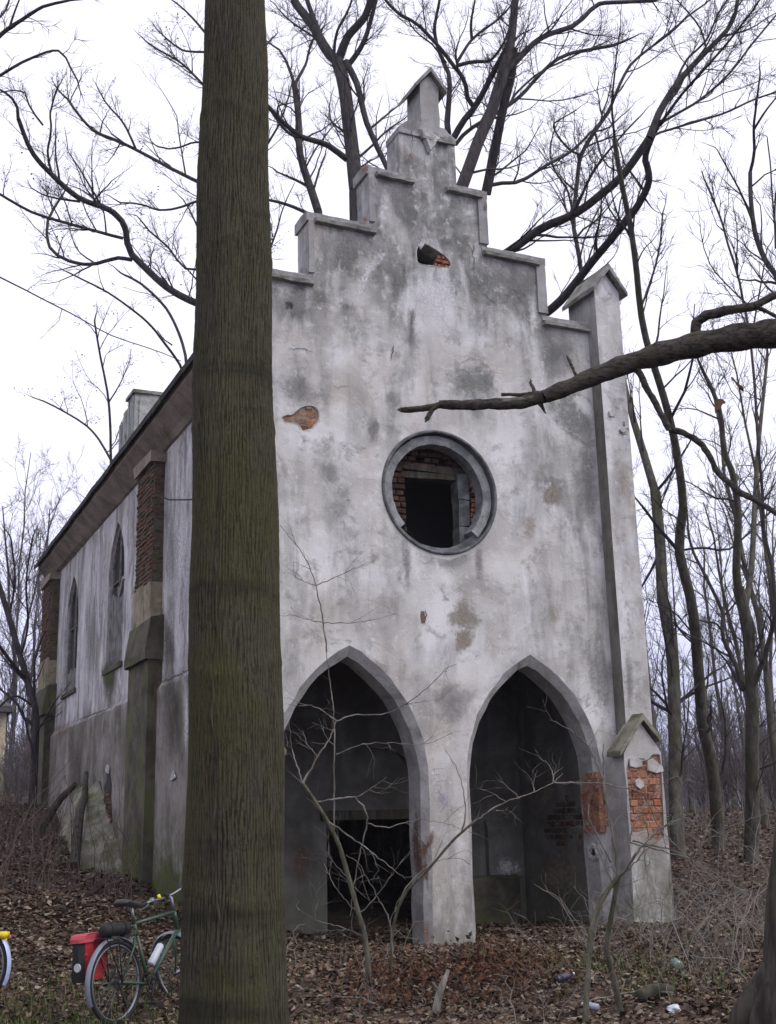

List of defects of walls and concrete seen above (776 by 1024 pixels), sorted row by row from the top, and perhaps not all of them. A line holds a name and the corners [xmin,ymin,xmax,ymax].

spalling [415,238,452,268]
spalling [281,405,320,431]
leakage [451,603,477,649]
flaking render [629,758,664,789]
flaking render [103,789,113,822]